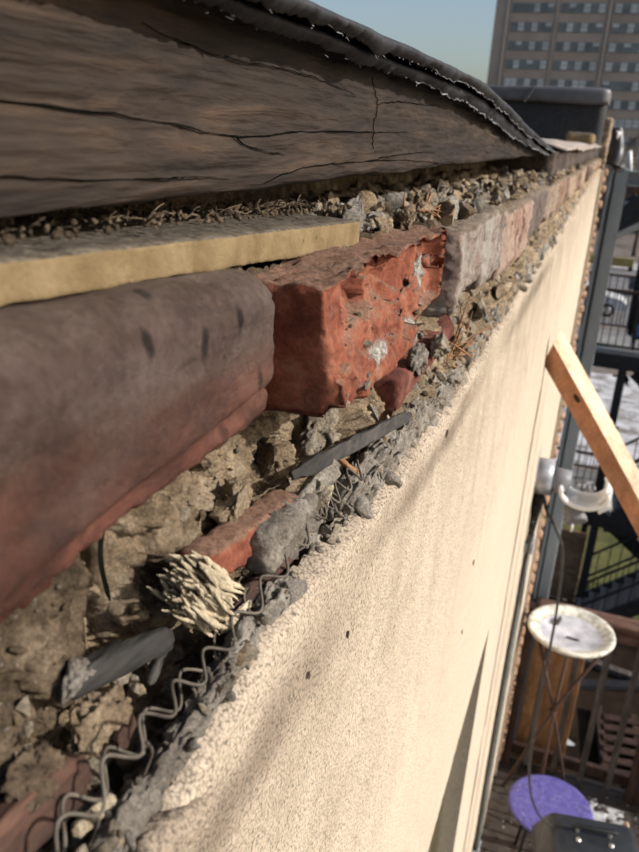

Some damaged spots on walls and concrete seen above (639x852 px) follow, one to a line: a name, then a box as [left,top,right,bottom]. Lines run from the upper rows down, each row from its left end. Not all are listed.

crack [0,22,458,183]
spalling [518,226,564,292]
spalling [385,469,403,489]
spalling [354,494,374,519]
spalling [254,579,308,626]